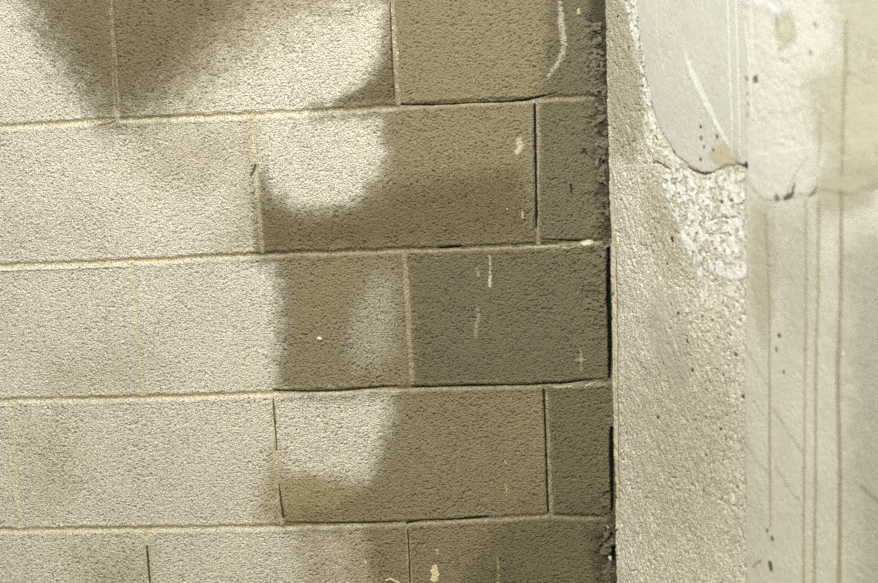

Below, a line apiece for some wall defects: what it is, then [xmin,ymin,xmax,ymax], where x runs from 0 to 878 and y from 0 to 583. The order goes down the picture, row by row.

crack [389,3,582,241]
peeling [617,0,748,317]
crack [279,484,489,583]